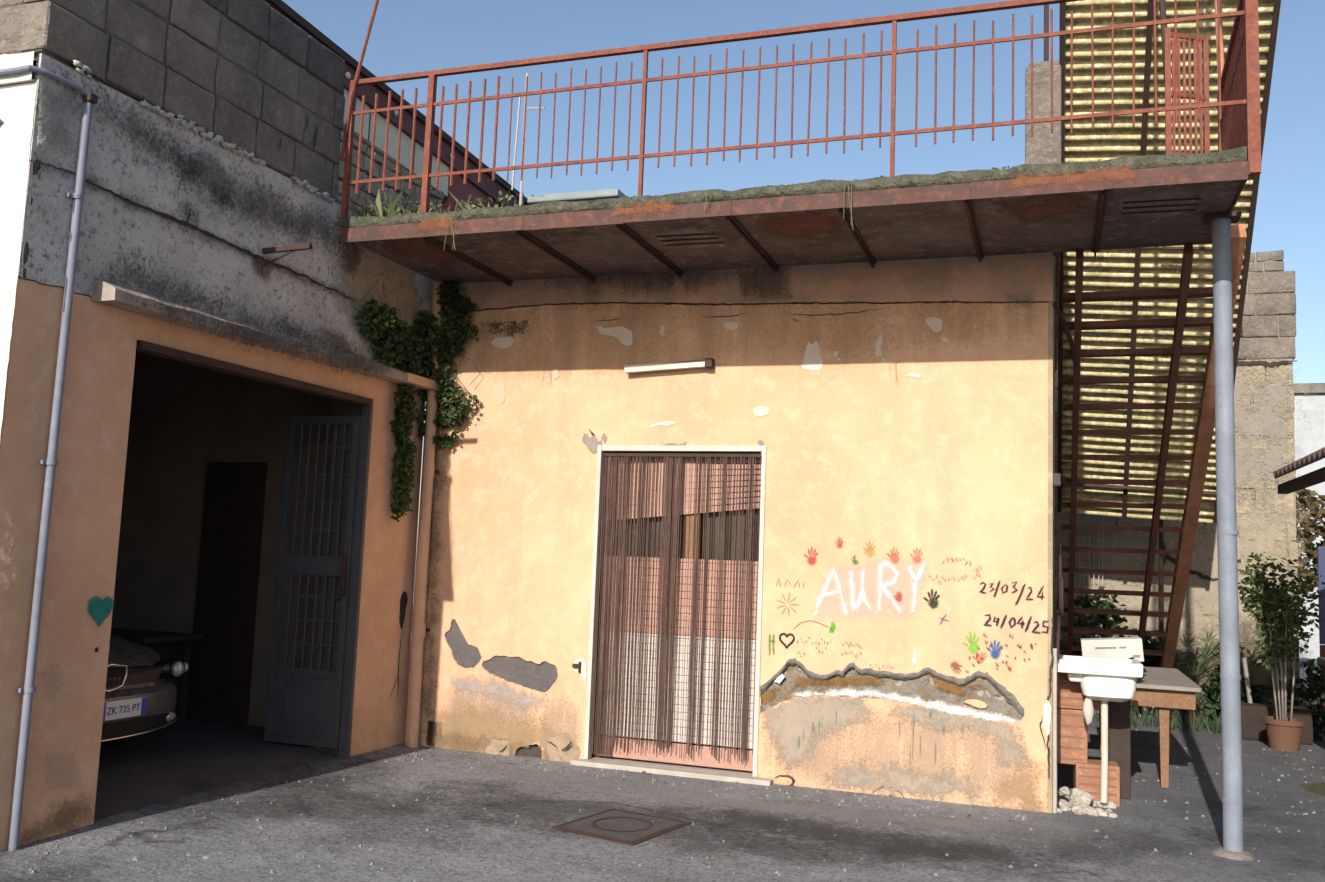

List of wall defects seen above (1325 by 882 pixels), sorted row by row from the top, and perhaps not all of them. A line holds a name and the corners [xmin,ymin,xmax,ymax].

leakage [26,60,424,376]
corrosion [373,216,458,266]
corrosion [612,202,673,215]
corrosion [756,212,842,238]
peeling [594,326,633,346]
peeling [801,341,841,371]
flaking render [443,617,587,694]
flaking render [760,658,1024,724]
flaking render [1043,700,1051,736]